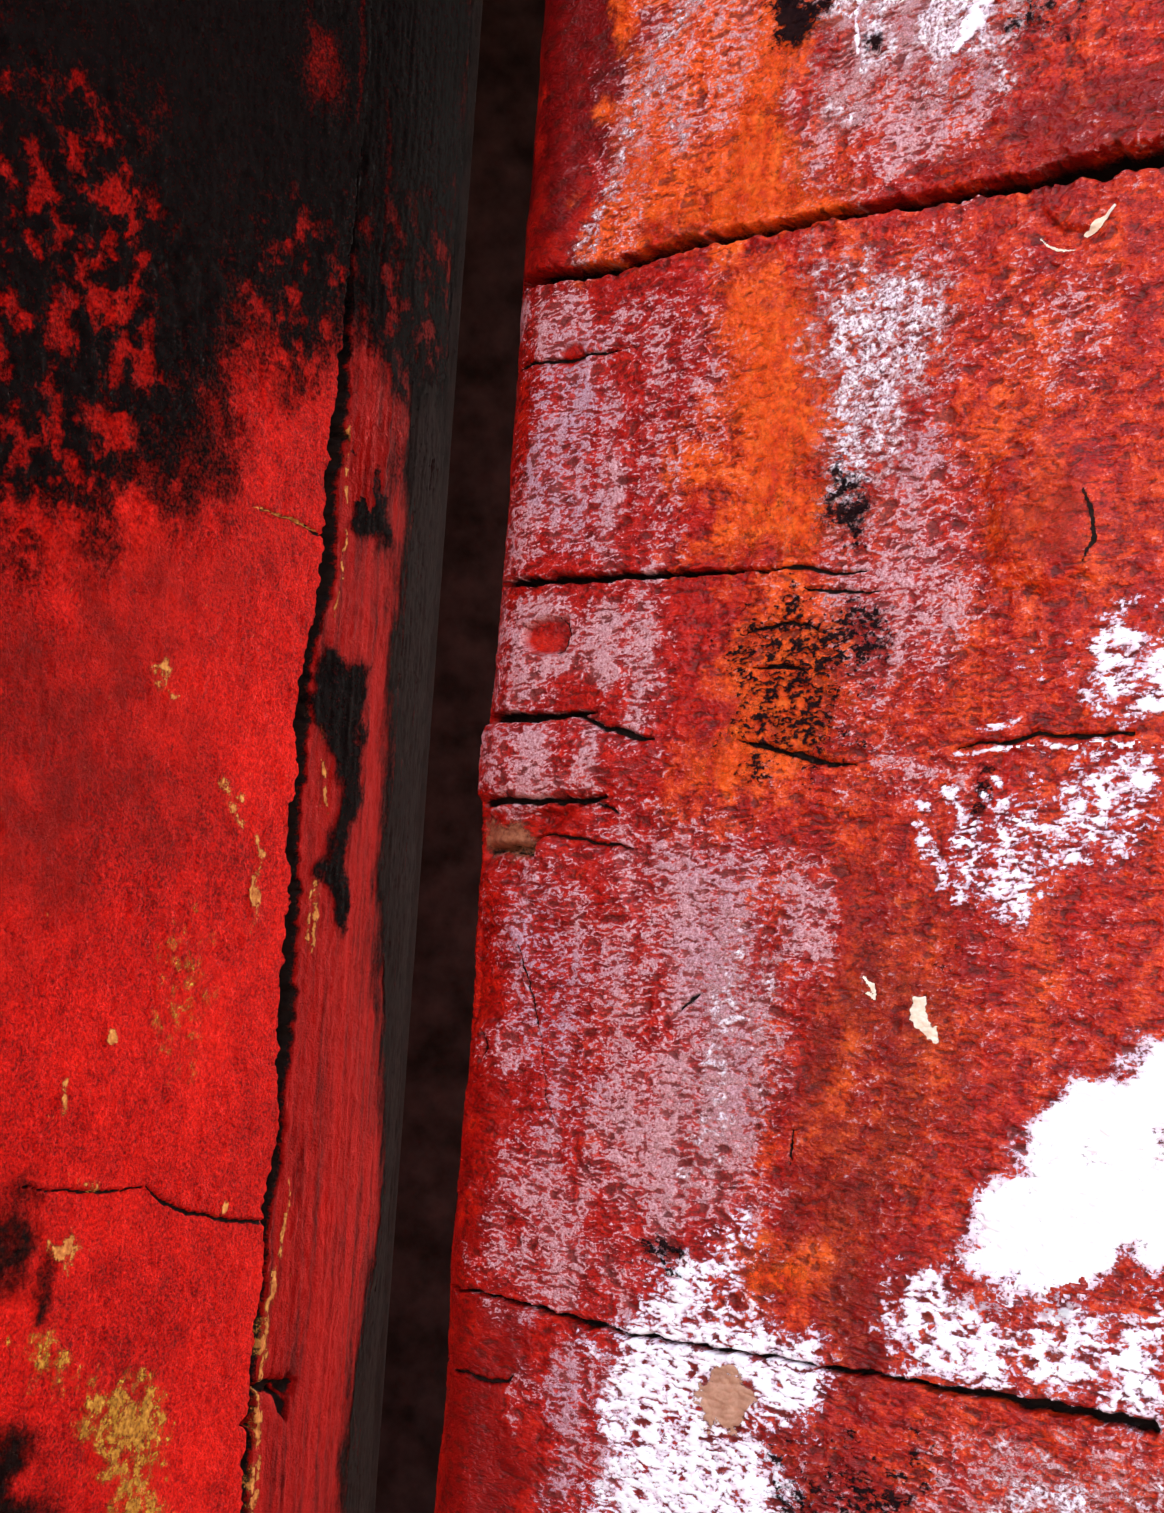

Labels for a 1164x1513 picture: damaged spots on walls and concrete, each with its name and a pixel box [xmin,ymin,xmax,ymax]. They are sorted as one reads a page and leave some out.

crack [742,586,880,675]
crack [500,712,655,741]
crack [738,739,858,767]
crack [22,253,351,1513]
peeling [862,976,877,1000]
peeling [909,996,939,1044]
peeling [563,880,839,1513]
peeling [864,1030,1164,1434]
crack [456,1369,514,1383]
flaking render [29,1331,175,1513]
damp [0,1423,58,1513]